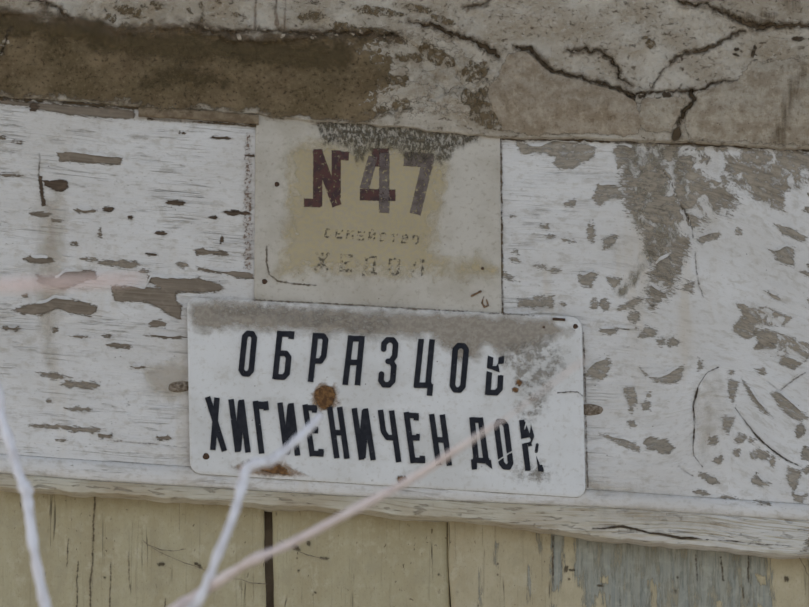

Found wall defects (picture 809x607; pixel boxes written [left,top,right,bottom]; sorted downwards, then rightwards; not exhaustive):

crack [191,19,399,40]
crack [674,0,809,62]
crack [416,21,767,149]
spalling [29,163,69,223]
peeling [586,142,809,348]
peeling [14,256,254,339]
peeling [733,290,809,370]
corrosion [251,462,299,476]
corrosion [313,384,337,410]
crack [692,367,719,476]
crack [735,408,799,466]
peeling [574,538,775,607]